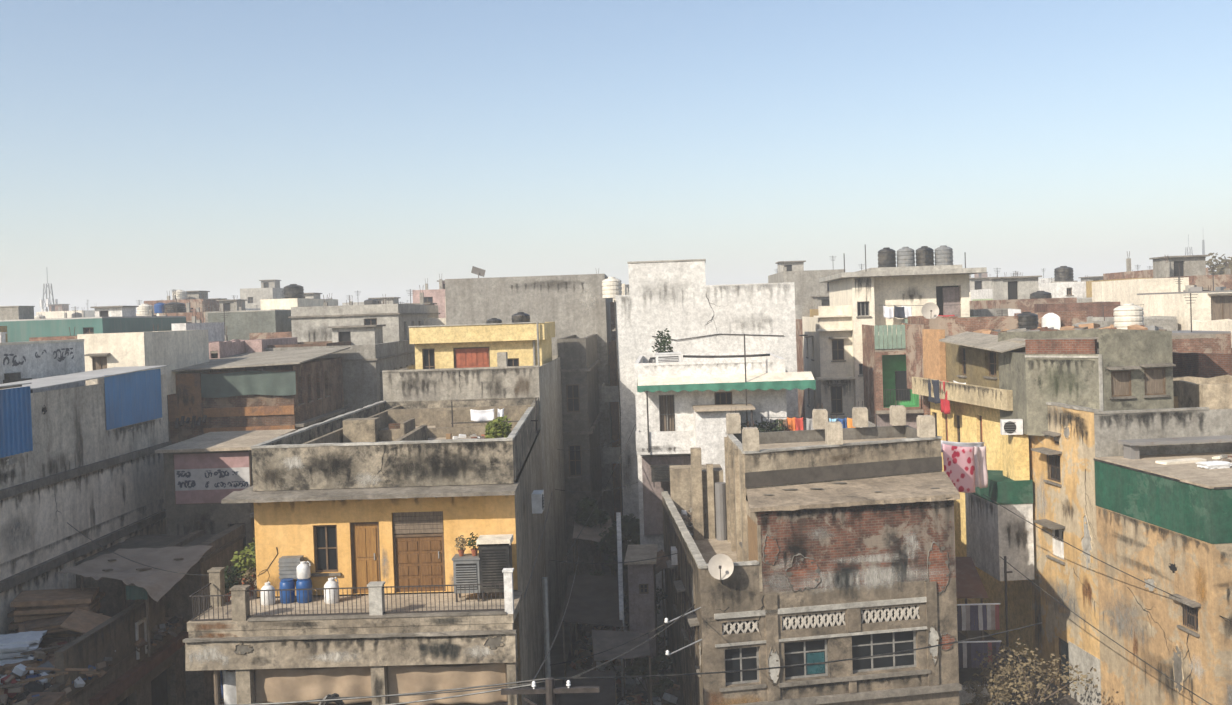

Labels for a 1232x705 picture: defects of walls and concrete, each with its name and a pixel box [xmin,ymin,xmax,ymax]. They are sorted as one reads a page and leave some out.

leakage [265,457,376,484]
leakage [394,442,505,476]
flaking render [762,534,822,592]